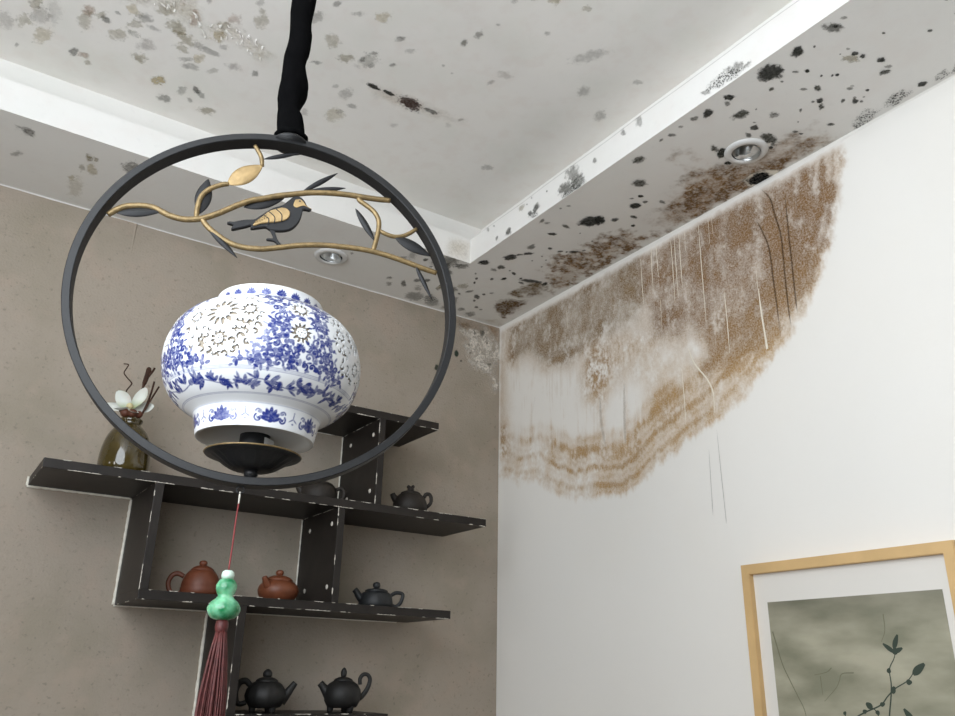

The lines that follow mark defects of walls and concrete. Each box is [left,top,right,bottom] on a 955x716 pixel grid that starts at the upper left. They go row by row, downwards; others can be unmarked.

damp [447,64,851,506]
damp [886,70,955,106]